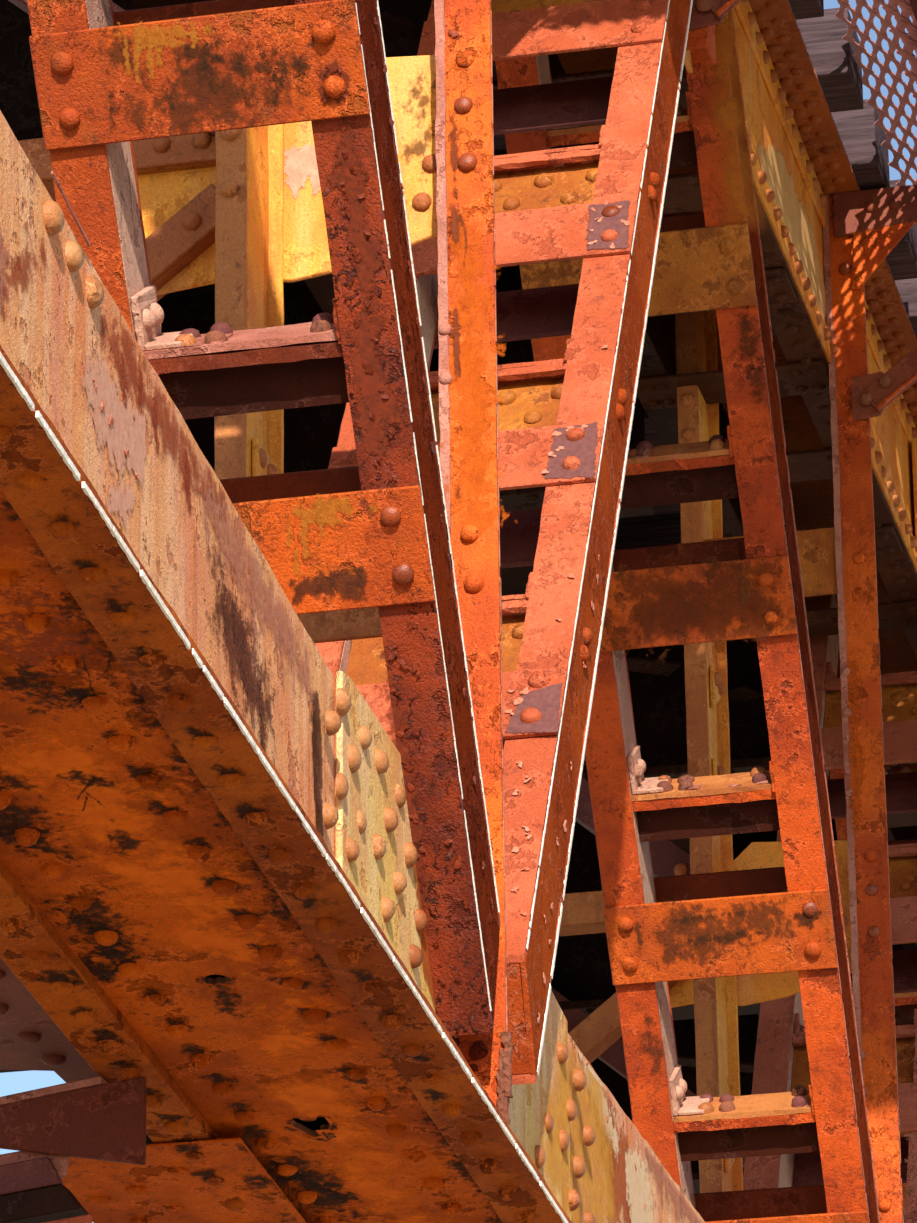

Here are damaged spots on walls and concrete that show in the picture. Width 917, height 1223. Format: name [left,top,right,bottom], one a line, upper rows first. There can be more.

corrosion [101,29,133,66]
corrosion [174,43,211,65]
corrosion [404,77,436,155]
corrosion [0,220,48,321]
corrosion [0,577,142,682]
corrosion [94,307,280,766]
corrosion [289,566,367,604]
corrosion [311,691,323,838]
corrosion [794,910,821,929]
corrosion [0,728,452,1223]
corrosion [637,1017,664,1075]
corrosion [589,1087,702,1223]